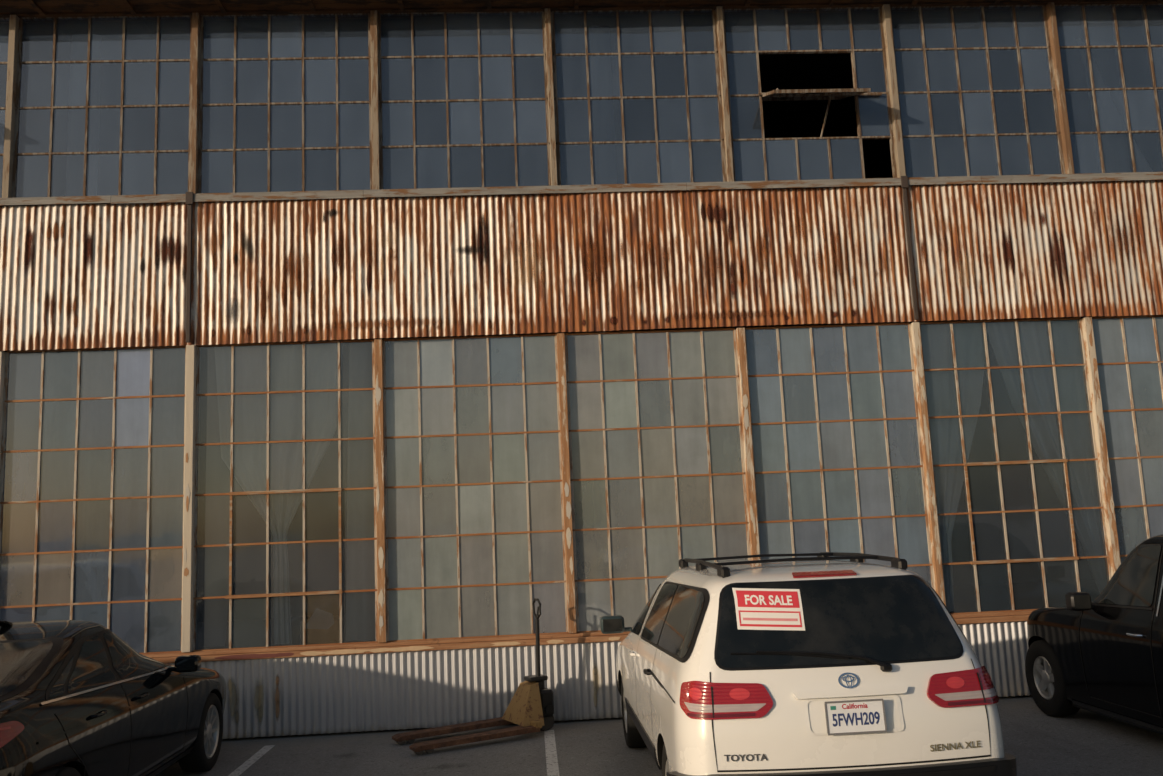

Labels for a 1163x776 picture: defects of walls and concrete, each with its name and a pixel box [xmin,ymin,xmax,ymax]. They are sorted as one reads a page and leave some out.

rust [24,228,34,274]
rust [84,236,93,266]
rust [140,235,186,279]
rust [257,247,455,333]
rust [473,218,489,266]
rust [507,239,545,290]
rust [569,237,624,325]
rust [637,235,679,306]
rust [664,204,807,322]
rust [818,220,856,317]
rust [921,213,983,304]
rust [1041,214,1068,300]